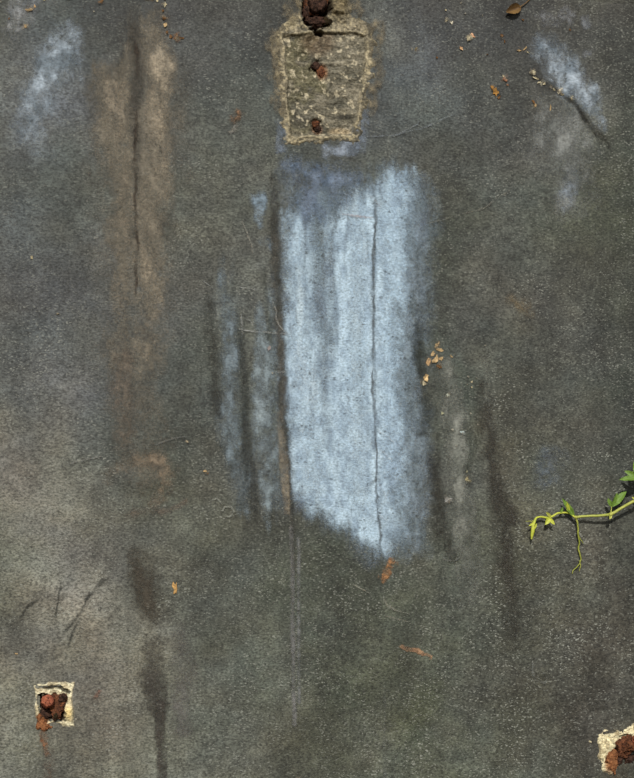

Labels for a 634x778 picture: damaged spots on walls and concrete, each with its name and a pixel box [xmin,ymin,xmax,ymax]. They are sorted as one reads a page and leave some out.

leakage [22,28,78,133]
rust [302,5,333,30]
spalling [270,0,378,147]
leakage [90,10,175,316]
crack [370,212,378,328]
leakage [207,162,429,664]
crack [374,438,382,544]
leakage [432,398,479,575]
leakage [129,553,157,621]
leakage [140,644,187,778]